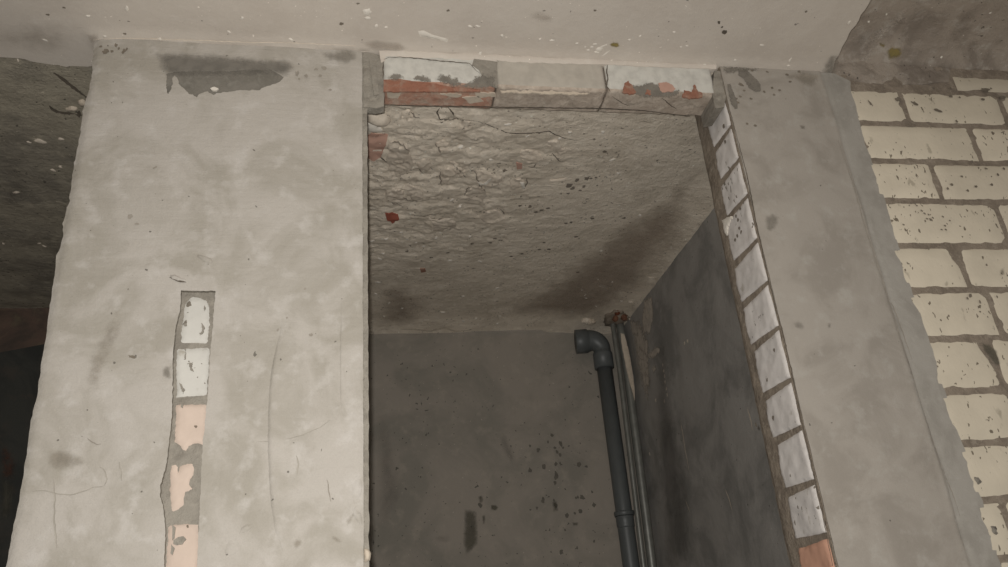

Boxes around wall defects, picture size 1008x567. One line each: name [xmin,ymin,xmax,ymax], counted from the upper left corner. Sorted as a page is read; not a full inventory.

water stain [163,56,289,73]
spalling [383,59,590,104]
crack [402,65,685,140]
spalling [622,81,703,100]
water stain [544,227,660,310]
flaking render [161,275,215,567]